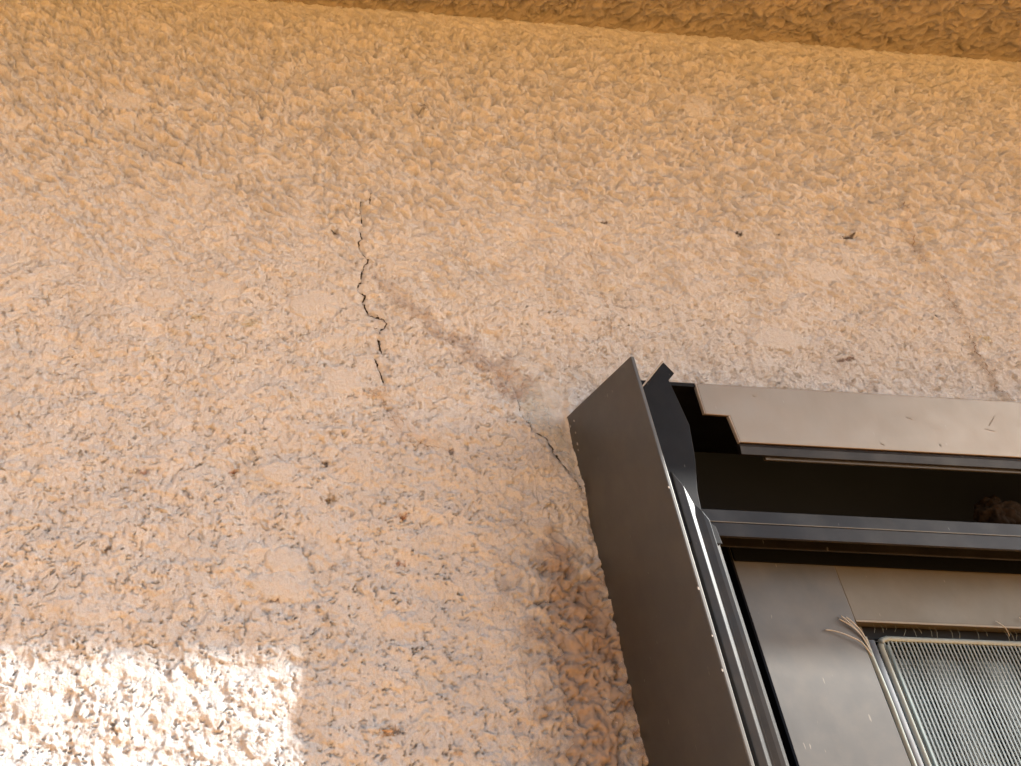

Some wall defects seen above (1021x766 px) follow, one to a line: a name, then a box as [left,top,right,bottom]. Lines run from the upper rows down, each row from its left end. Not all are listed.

crack [357,193,448,451]
crack [515,393,583,492]